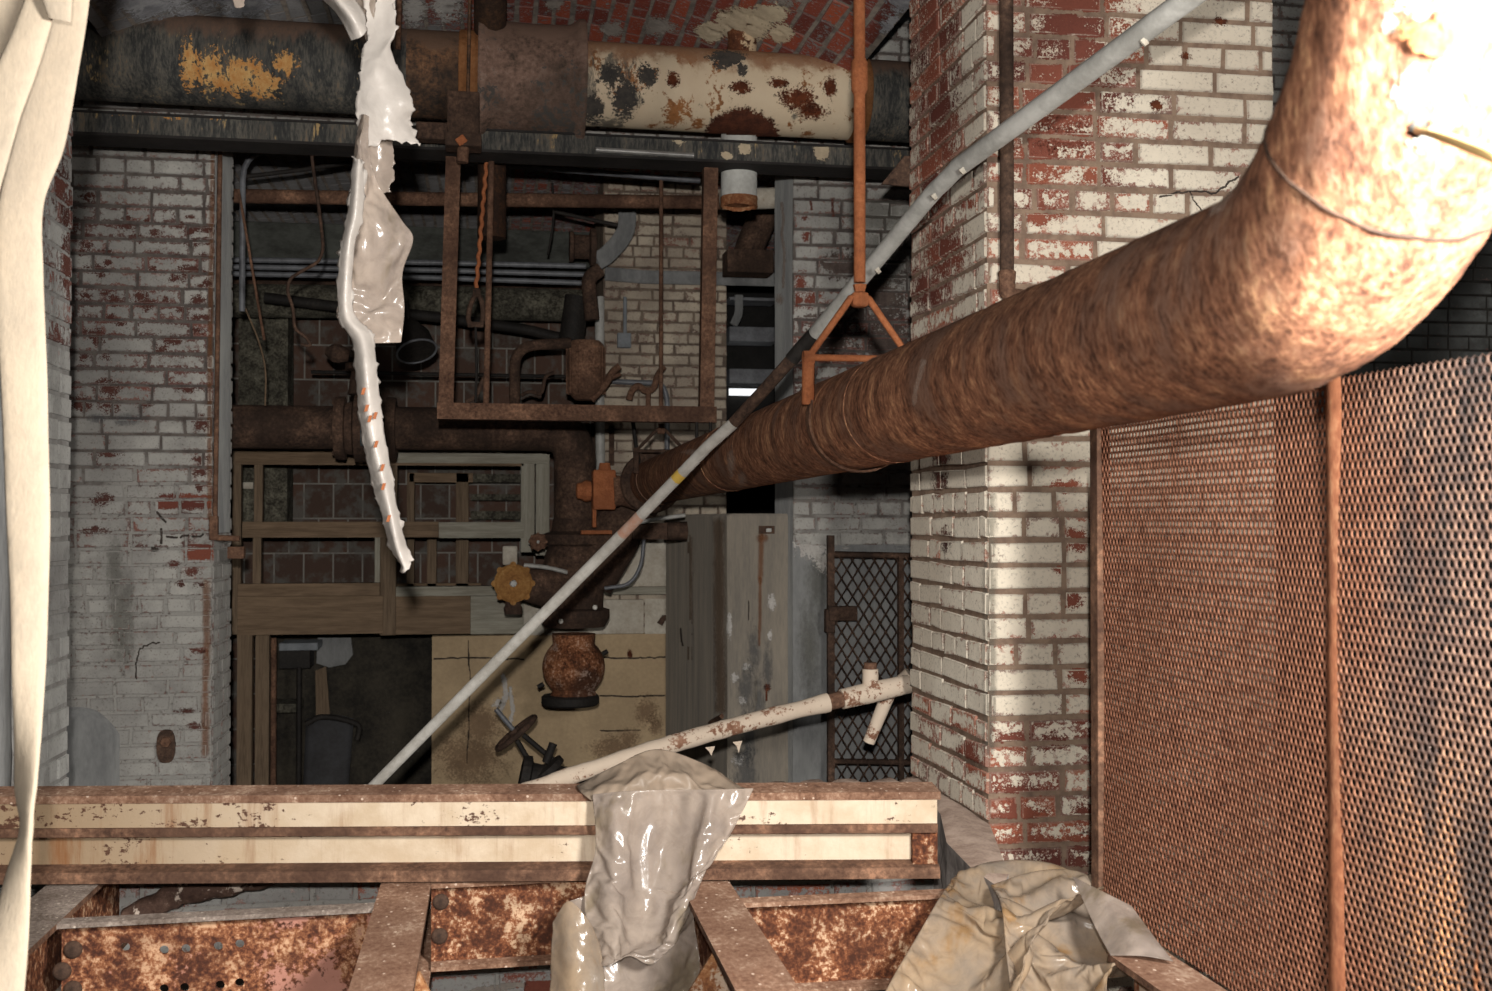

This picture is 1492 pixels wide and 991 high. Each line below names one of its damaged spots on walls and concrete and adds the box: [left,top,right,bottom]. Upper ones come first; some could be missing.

peeling [986,0,1141,127]
peeling [1014,54,1138,229]
spalling [52,156,215,414]
spalling [90,492,115,507]
peeling [158,453,213,511]
spalling [79,525,112,534]
peeling [167,544,214,588]
spalling [173,707,204,732]
peeling [946,723,983,775]
peeling [992,729,1070,754]
peeling [989,780,1091,867]